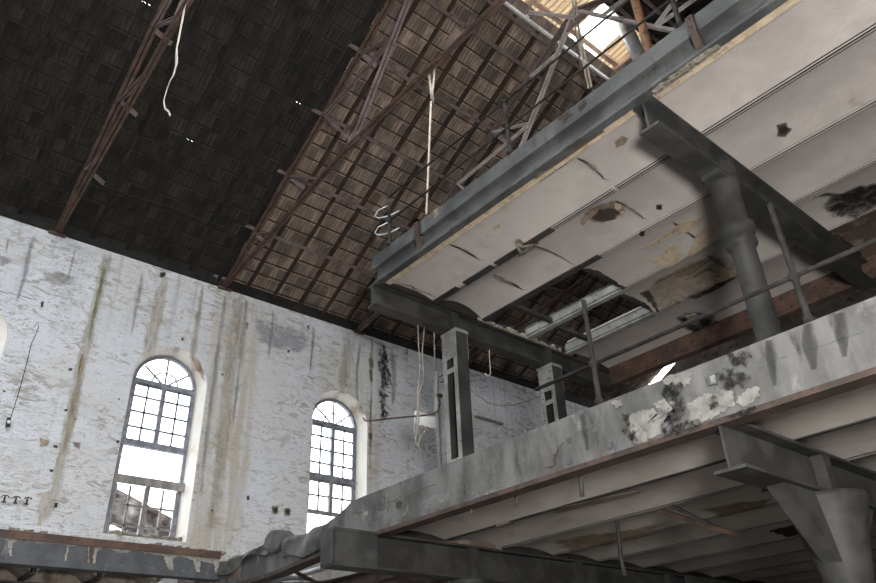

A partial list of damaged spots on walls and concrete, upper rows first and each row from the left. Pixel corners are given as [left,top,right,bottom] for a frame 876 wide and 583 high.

leakage [582,202,625,223]
leakage [360,343,395,447]
spalling [611,351,761,445]
peeling [0,530,321,583]